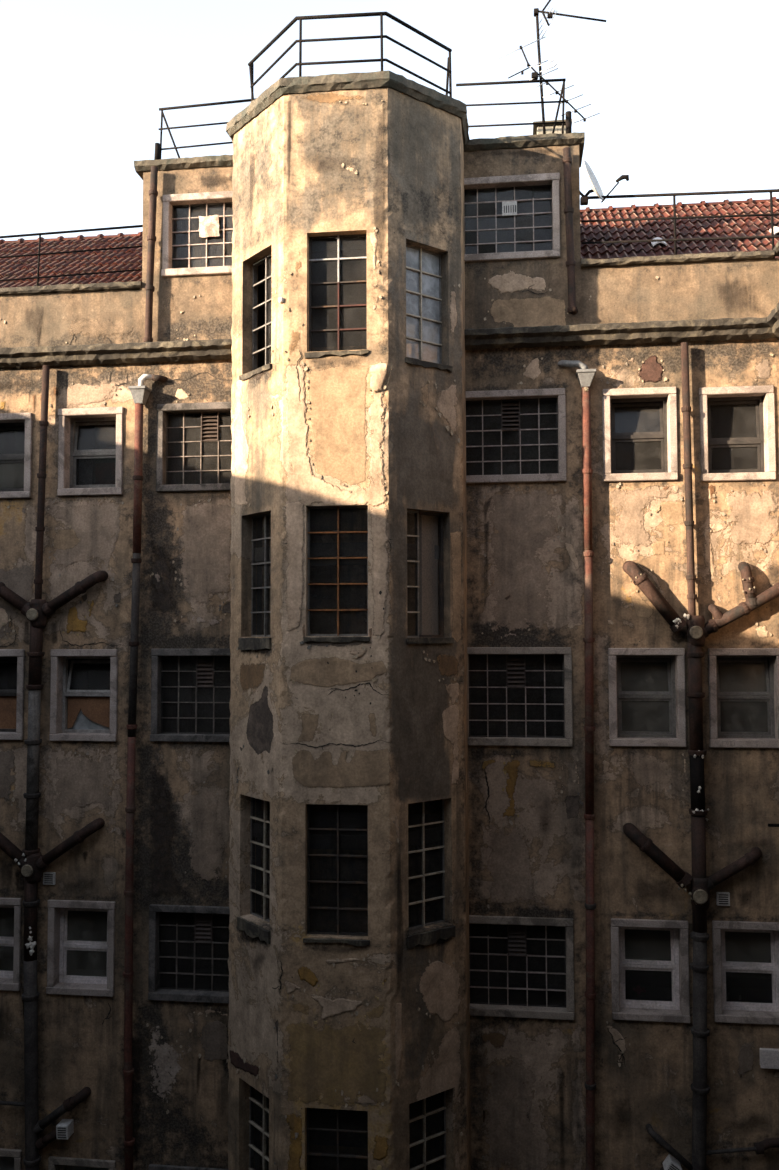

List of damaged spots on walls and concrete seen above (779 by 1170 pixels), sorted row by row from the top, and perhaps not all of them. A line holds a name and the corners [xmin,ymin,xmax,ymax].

peeling [450,284,460,333]
peeling [484,270,569,327]
spalling [625,355,667,383]
peeling [240,658,274,755]
crack [328,682,388,695]
water stain [150,768,184,897]
peeling [415,959,462,1105]